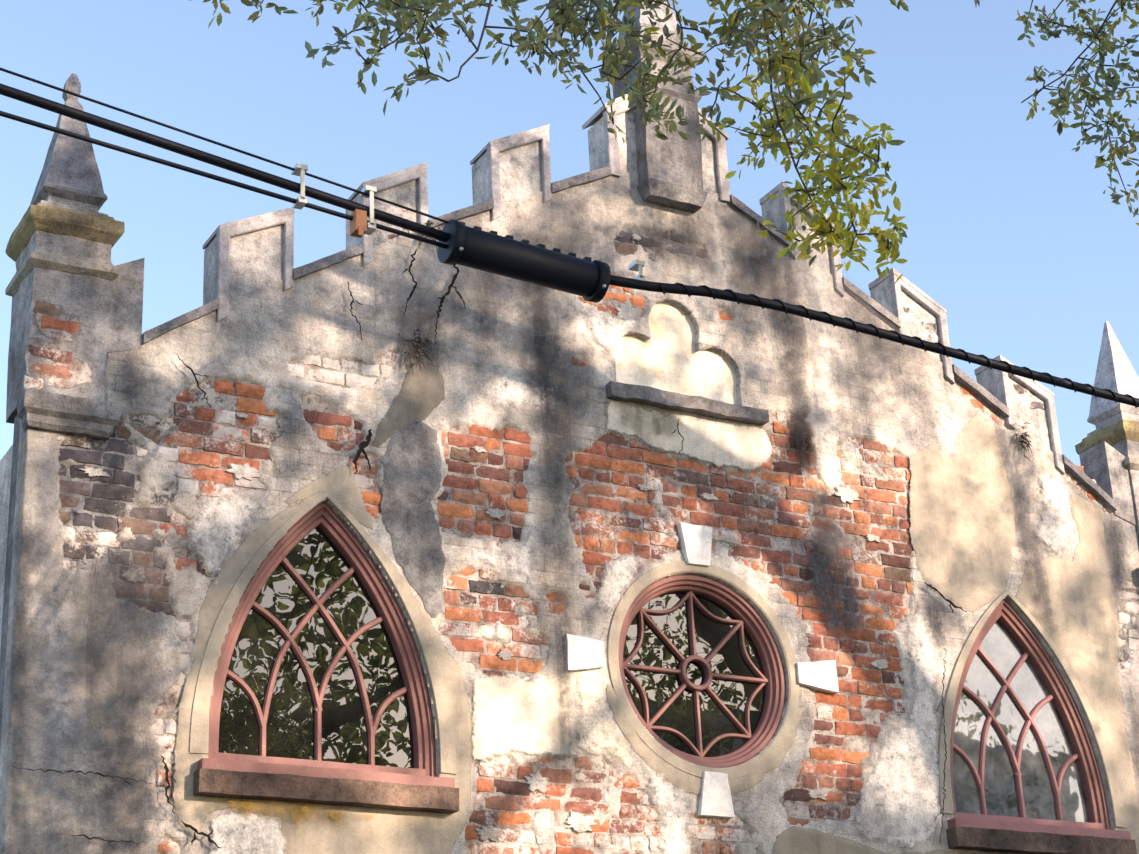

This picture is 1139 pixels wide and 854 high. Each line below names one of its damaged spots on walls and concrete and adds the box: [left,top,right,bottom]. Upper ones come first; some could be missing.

crack [402,249,466,338]
leakage [726,221,806,414]
crack [178,356,211,408]
flaking render [433,424,533,547]
flaking render [56,379,286,804]
flaking render [435,567,566,681]
flaking render [564,411,914,826]
leakage [810,495,858,629]
crack [924,582,967,613]
crack [13,756,221,848]
flaking render [461,756,660,854]
crack [934,648,947,843]